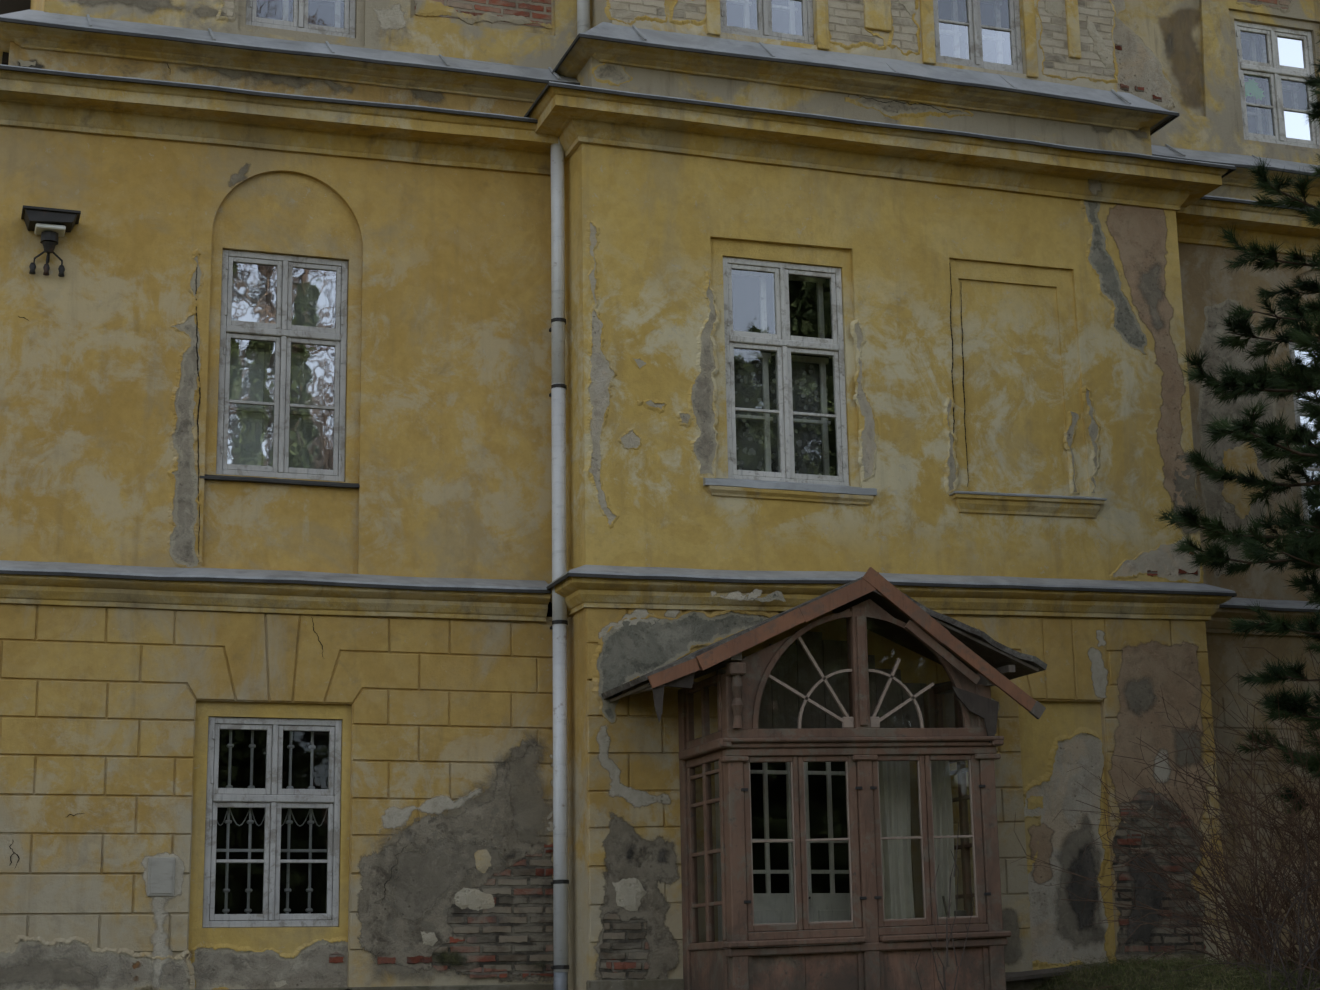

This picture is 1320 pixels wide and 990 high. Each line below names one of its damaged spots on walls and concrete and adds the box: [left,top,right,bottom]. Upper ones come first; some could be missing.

flaking render [375,0,552,30]
flaking render [605,0,707,26]
flaking render [828,0,921,56]
flaking render [1036,0,1176,111]
flaking render [166,248,204,568]
flaking render [583,219,619,529]
flaking render [637,272,720,475]
flaking render [850,319,879,482]
flaking render [1106,204,1277,584]
flaking render [0,740,554,990]
flaking render [594,812,680,980]